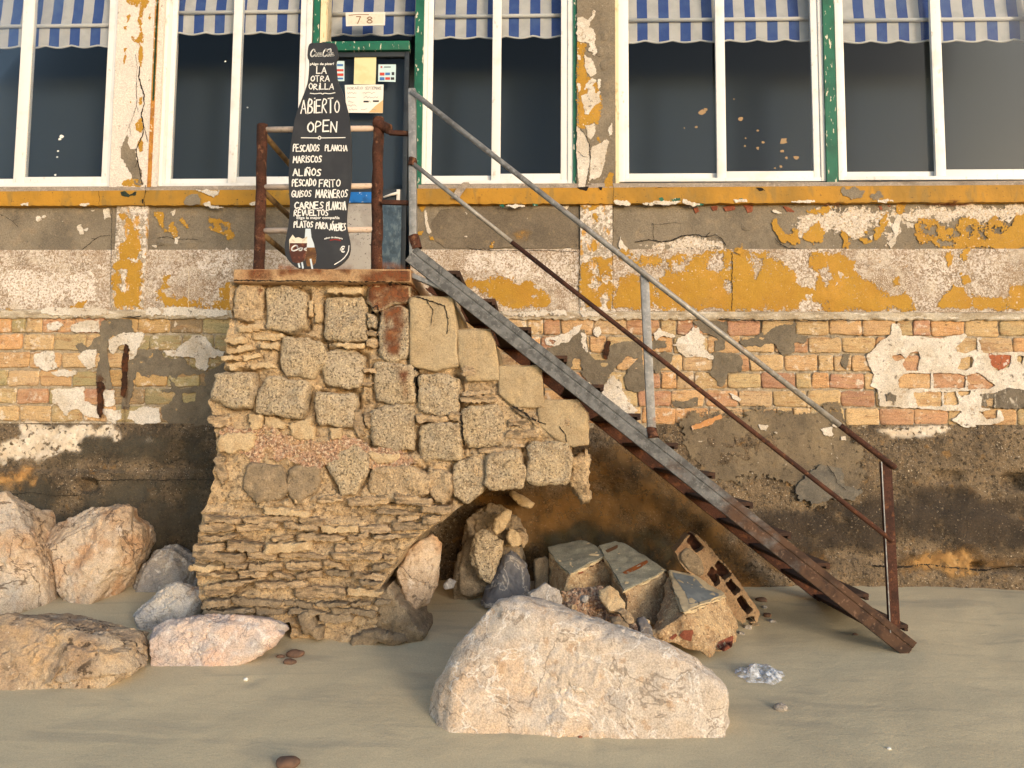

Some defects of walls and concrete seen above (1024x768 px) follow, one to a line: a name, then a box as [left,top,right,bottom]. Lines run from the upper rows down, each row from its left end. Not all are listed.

crack [127,54,148,207]
peeling [576,10,614,188]
rust [96,376,105,418]
peeling [0,189,238,486]
rust [120,344,129,398]
crack [612,186,864,322]
peeling [458,186,1024,440]
damp [14,435,215,552]